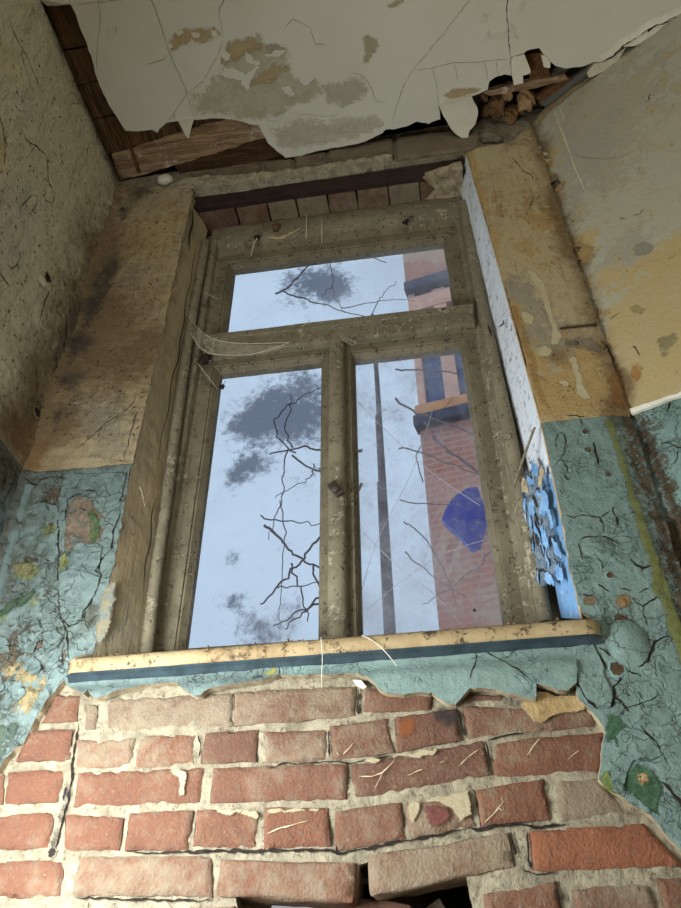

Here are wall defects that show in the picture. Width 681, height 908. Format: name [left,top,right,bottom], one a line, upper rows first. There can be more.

crack [600,6,681,62]
peeling [527,270,602,399]
crack [555,415,601,480]
flaking render [630,392,681,415]
crack [24,476,121,659]
peeling [57,472,126,644]
peeling [515,460,564,586]
crack [567,506,670,747]
flaking render [0,627,64,762]
crack [55,724,79,847]
flaking render [62,645,681,839]
crack [661,781,681,804]